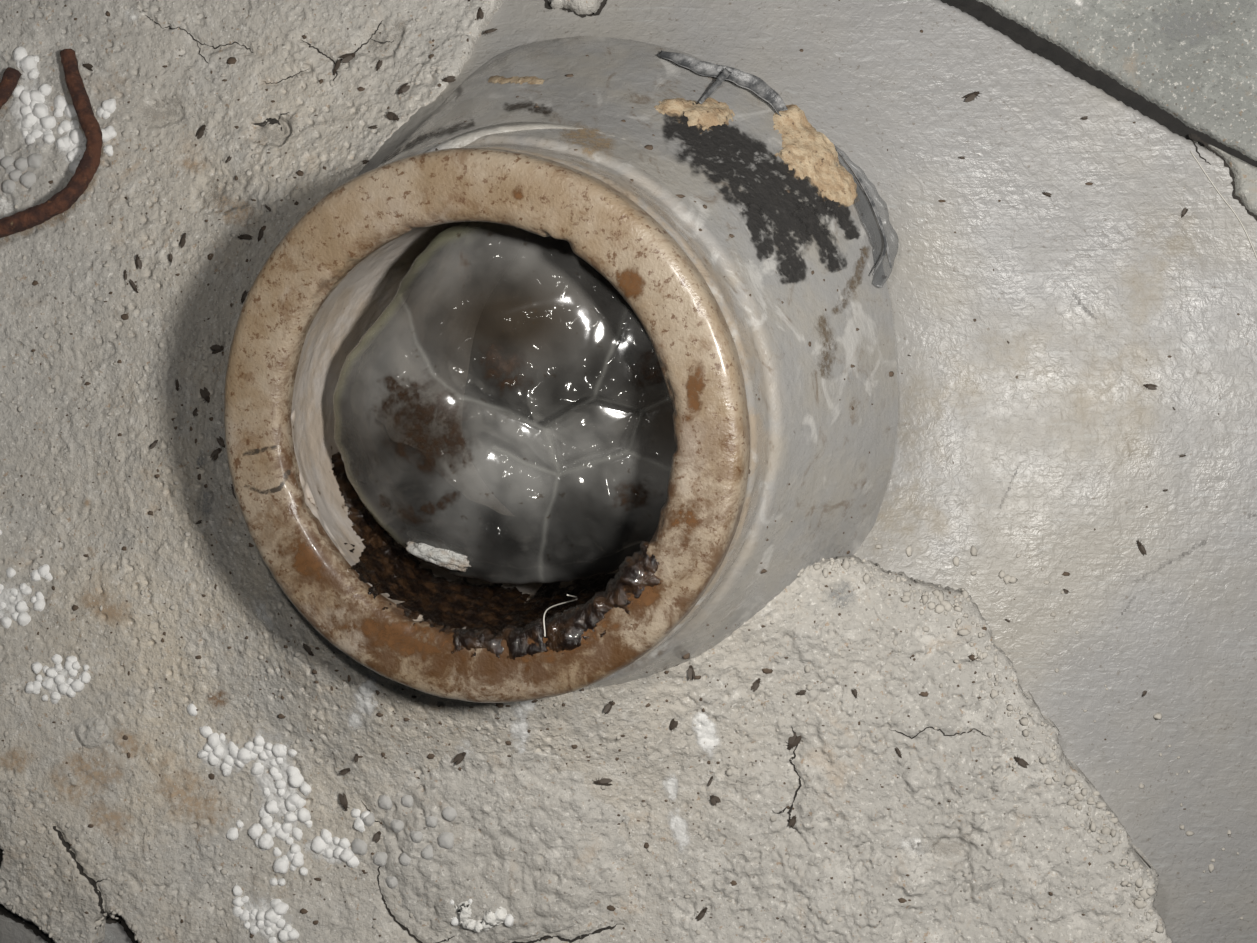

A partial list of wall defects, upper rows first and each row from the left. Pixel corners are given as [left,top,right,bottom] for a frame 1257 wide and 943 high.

crack [1189,133,1257,221]
leakage [745,203,774,260]
leakage [793,197,860,272]
rust [290,527,326,581]
rust [339,614,468,661]
rust [521,620,620,671]
efflorescence [254,730,305,833]
crack [377,866,454,943]
crack [512,924,624,943]